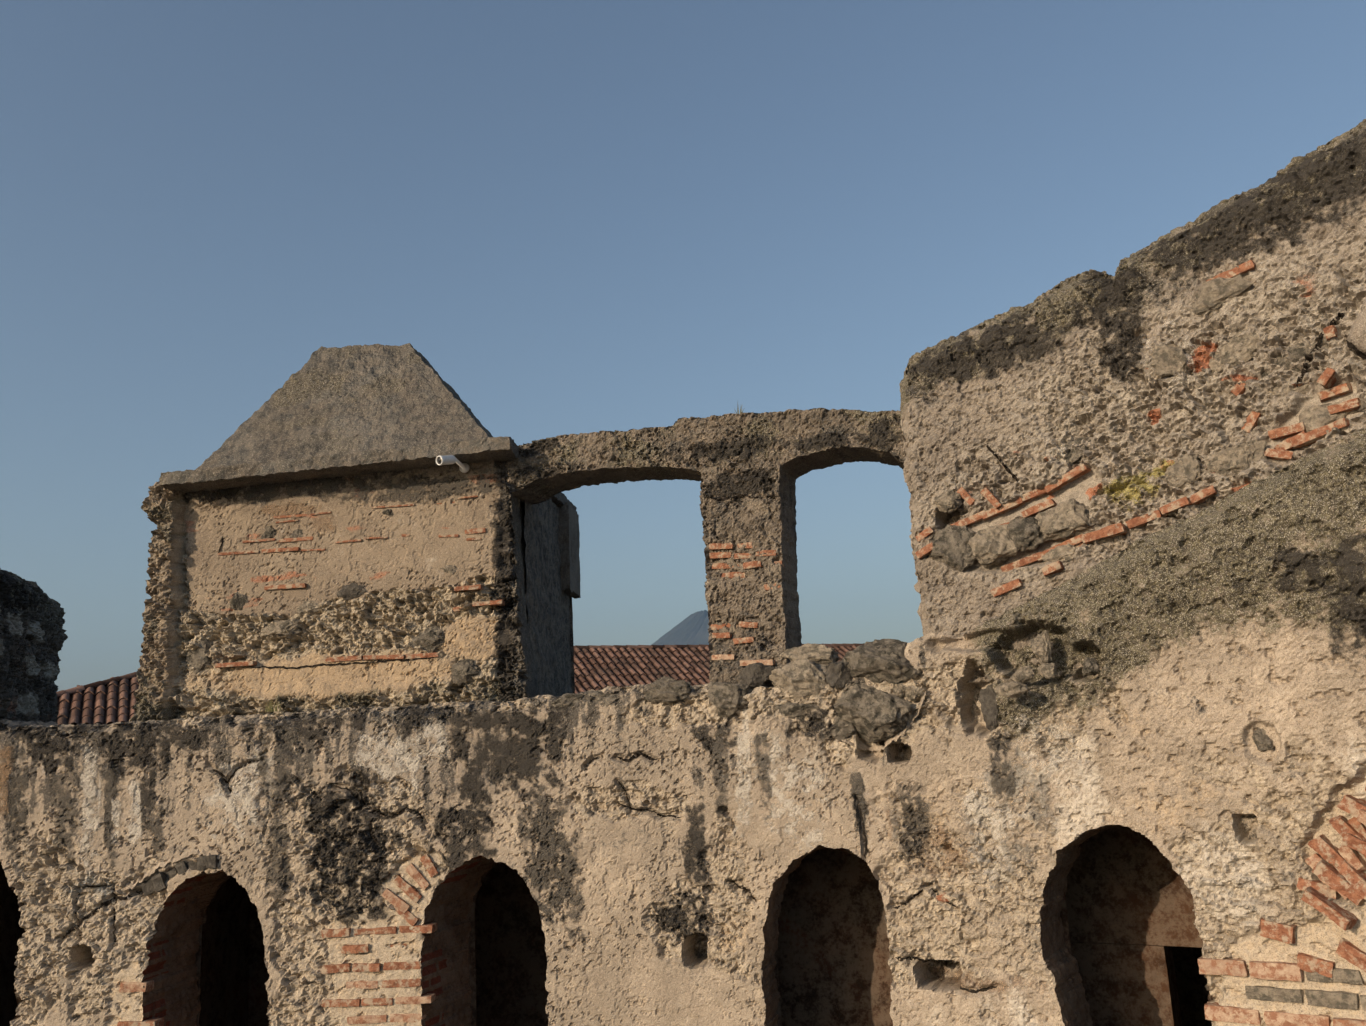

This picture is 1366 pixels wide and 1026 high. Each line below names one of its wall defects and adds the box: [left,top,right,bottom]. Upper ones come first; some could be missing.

flaking render [167,466,528,700]
water stain [160,437,585,942]
flaking render [321,849,449,1026]
crack [585,752,680,818]
flaking render [1198,769,1366,1026]